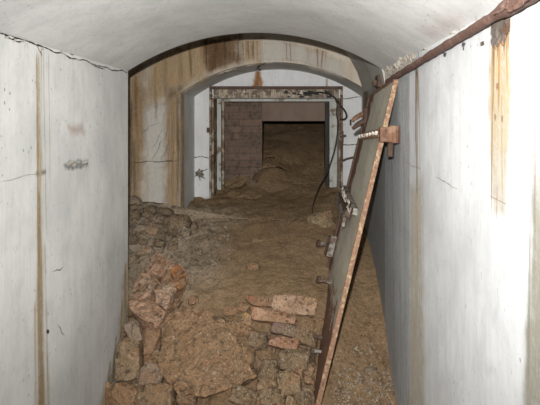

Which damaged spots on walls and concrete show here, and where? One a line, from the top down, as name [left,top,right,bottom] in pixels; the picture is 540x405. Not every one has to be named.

crack [0,33,127,73]
corrosion [204,34,240,71]
corrosion [490,32,510,179]
peeling [65,160,88,169]
crack [131,123,178,170]
leakage [34,208,48,405]